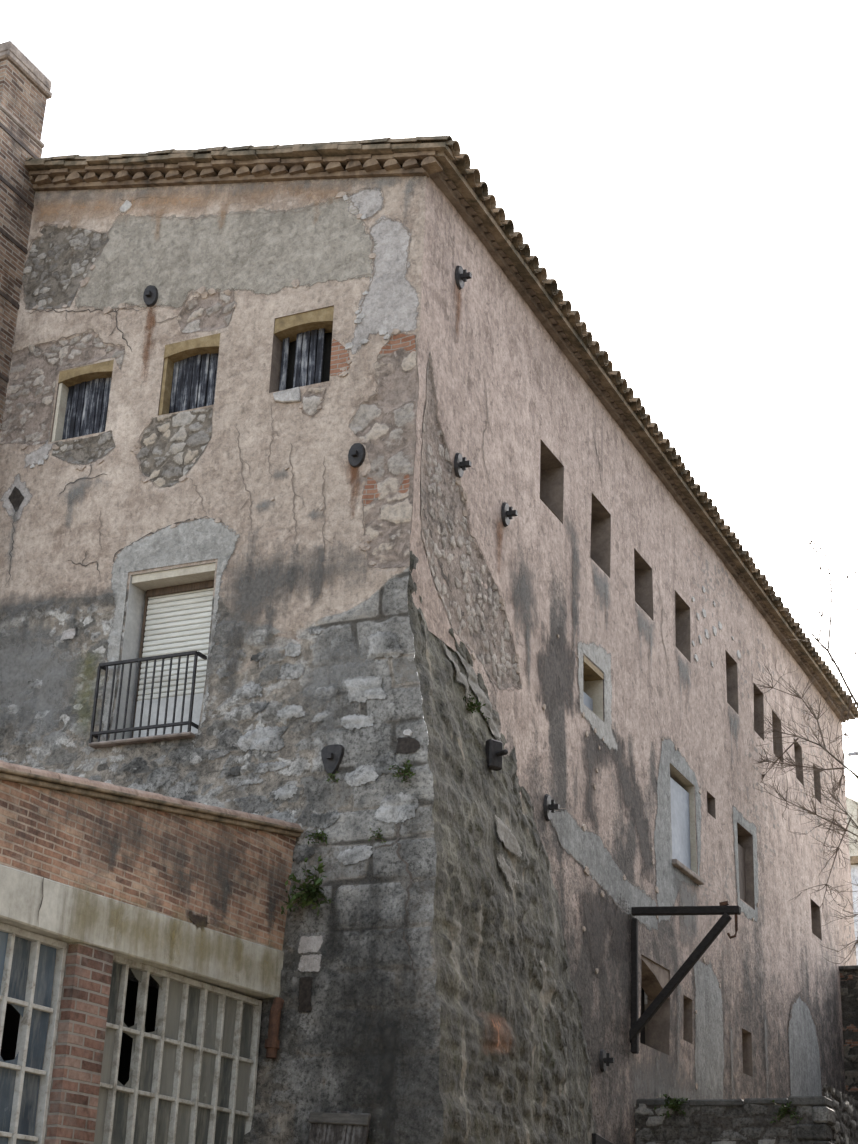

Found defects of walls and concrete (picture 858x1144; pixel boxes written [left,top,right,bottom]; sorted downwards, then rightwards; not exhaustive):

spalling [0,329,125,471]
spalling [8,486,24,512]
peeling [21,187,522,740]
water stain [514,566,533,685]
water stain [567,523,579,630]
water stain [594,568,610,608]
spalling [208,675,387,829]
spalling [337,844,373,865]
spalling [344,729,420,787]
spalling [374,791,419,824]
peeling [494,812,523,890]
peeling [537,631,655,882]